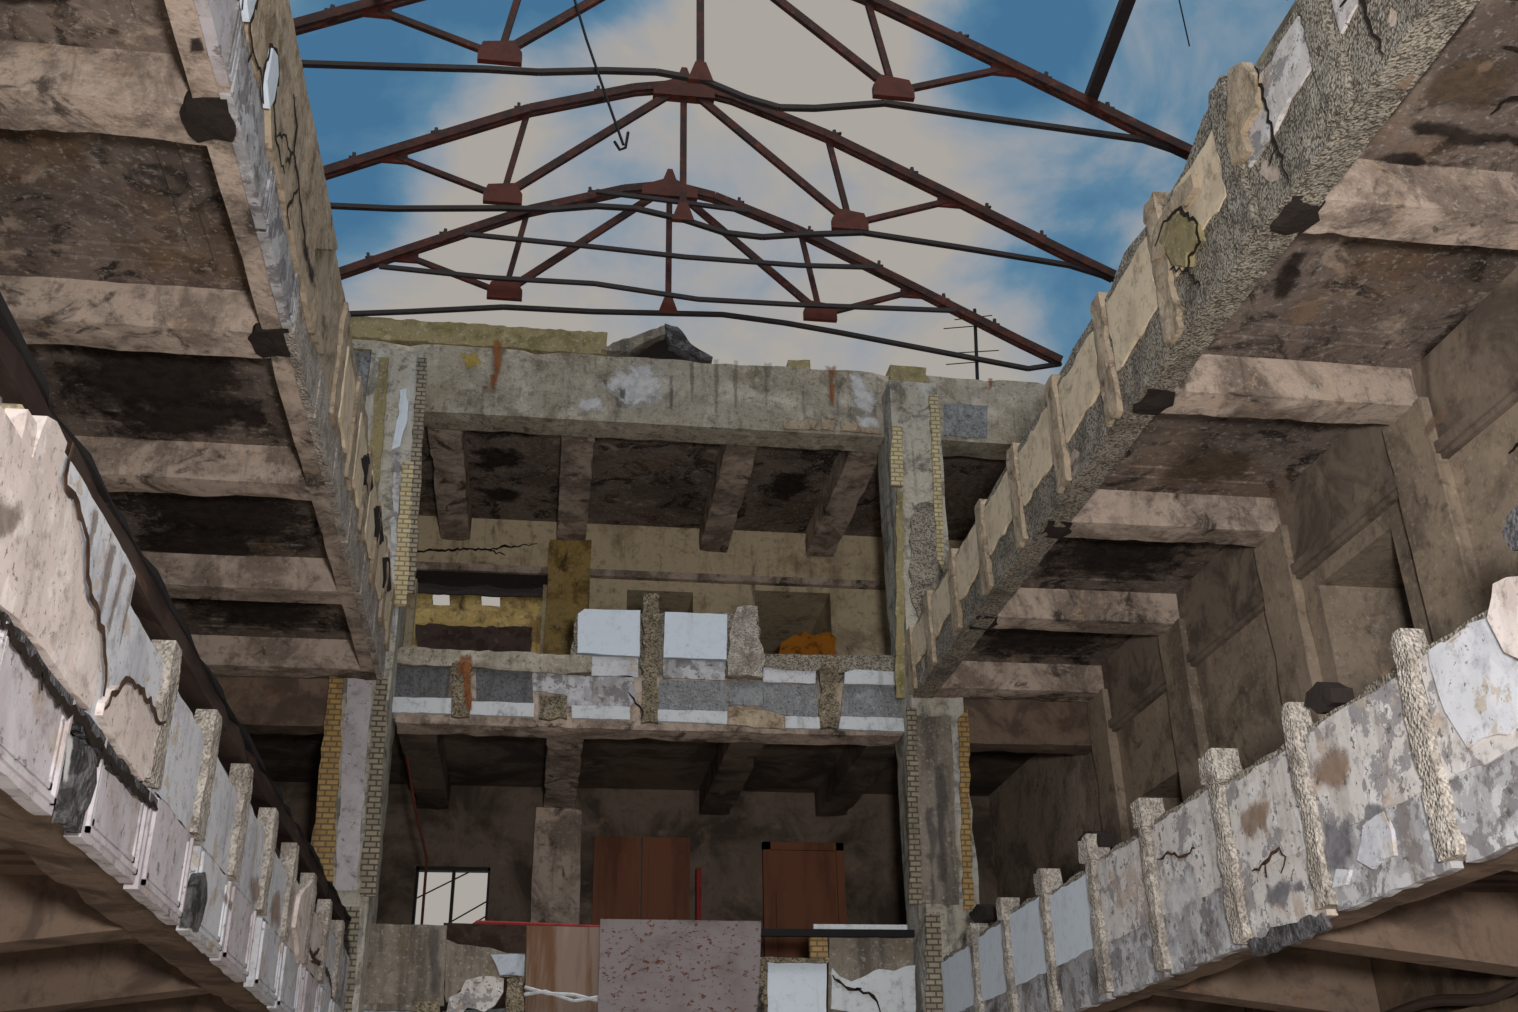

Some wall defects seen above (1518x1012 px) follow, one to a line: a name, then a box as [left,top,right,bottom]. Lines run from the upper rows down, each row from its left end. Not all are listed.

flaking render [240,0,256,22]
flaking render [260,48,279,109]
crack [242,0,308,257]
crack [1490,96,1518,114]
spalling [1270,195,1326,236]
flaking render [0,405,161,833]
crack [0,442,166,811]
spalling [180,872,233,932]
crack [832,975,881,1012]